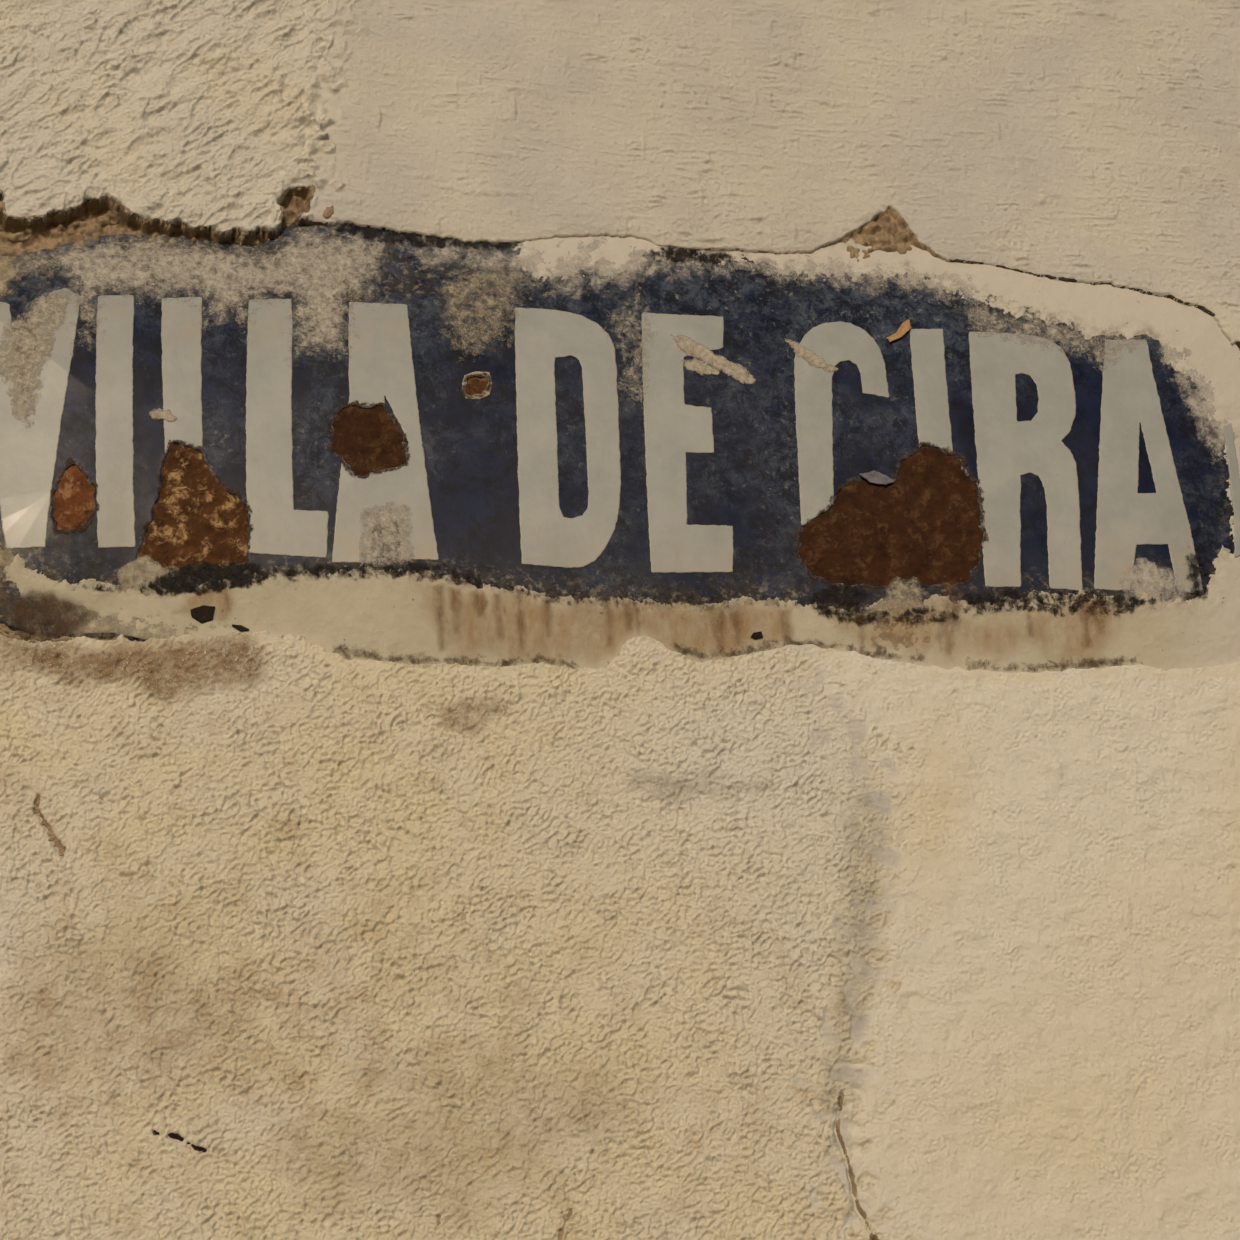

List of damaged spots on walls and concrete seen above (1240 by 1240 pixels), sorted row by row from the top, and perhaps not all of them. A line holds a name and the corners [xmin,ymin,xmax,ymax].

spalling [0,184,315,258]
spalling [798,208,947,262]
peeling [887,319,911,342]
peeling [670,334,756,384]
peeling [785,339,838,372]
peeling [149,408,177,422]
peeling [859,470,895,485]
spalling [0,615,72,643]
crack [835,1092,879,1240]